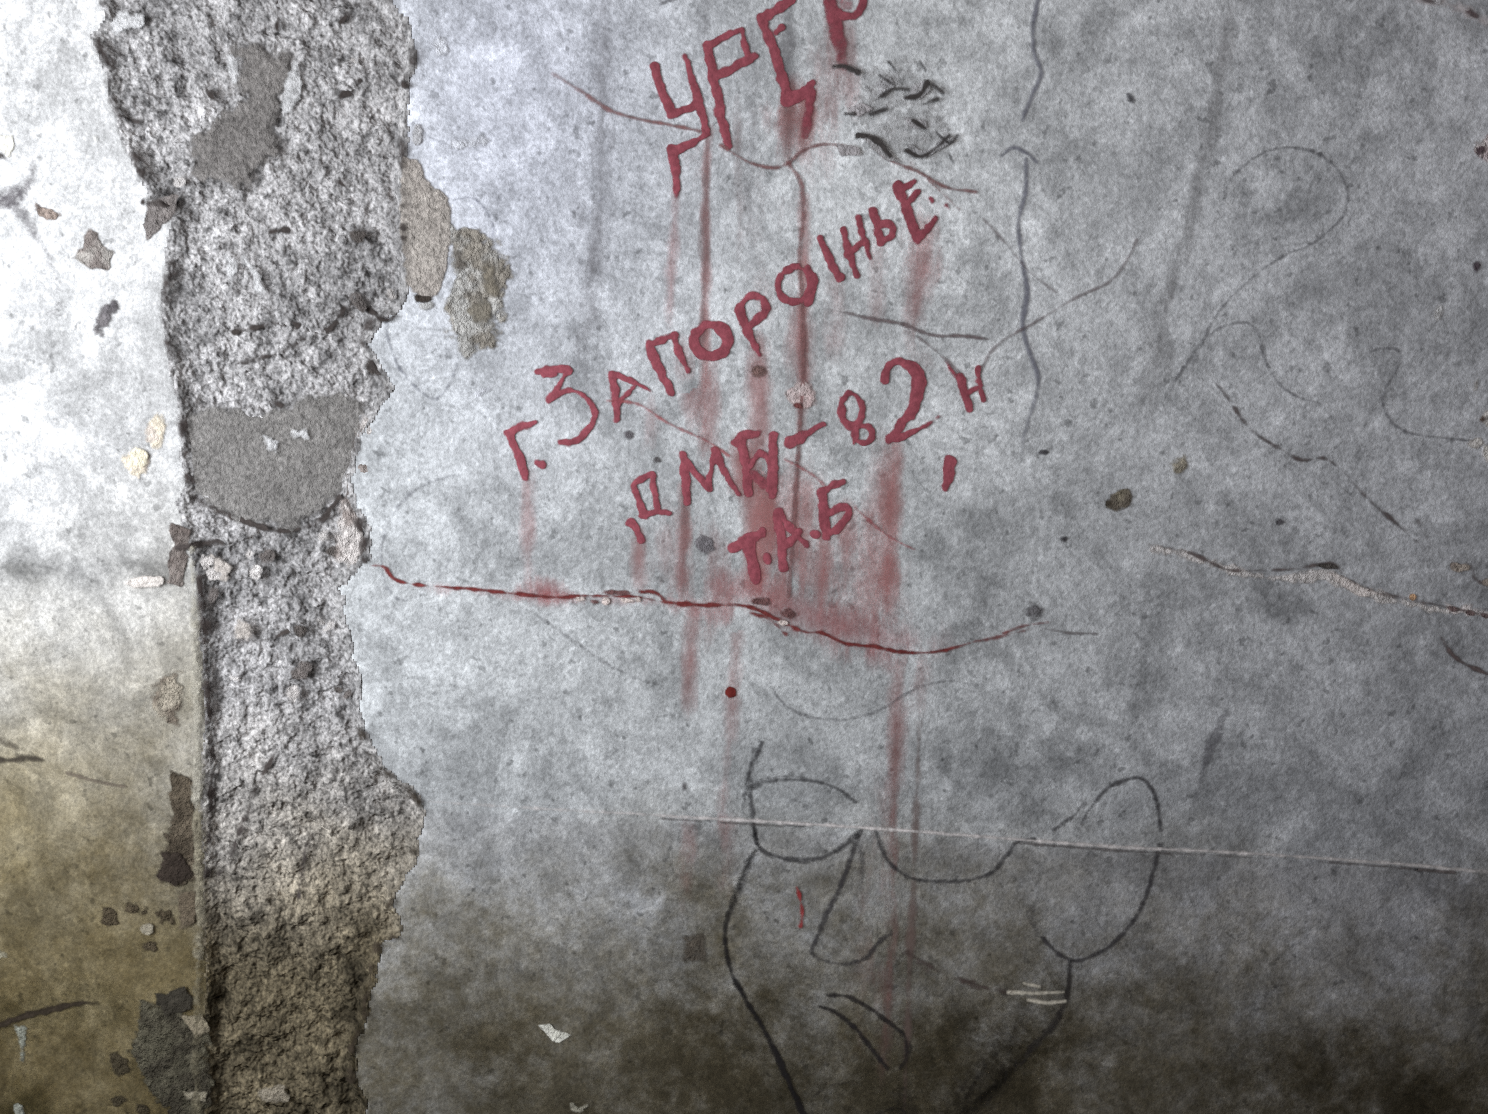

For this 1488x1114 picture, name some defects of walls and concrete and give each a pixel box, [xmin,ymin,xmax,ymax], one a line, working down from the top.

crack [1418,0,1488,25]
spalling [75,229,113,270]
crack [374,88,1023,654]
crack [1218,386,1325,461]
crack [1361,492,1401,528]
spalling [90,0,512,1114]
crack [1149,545,1488,675]
water stain [683,934,706,961]